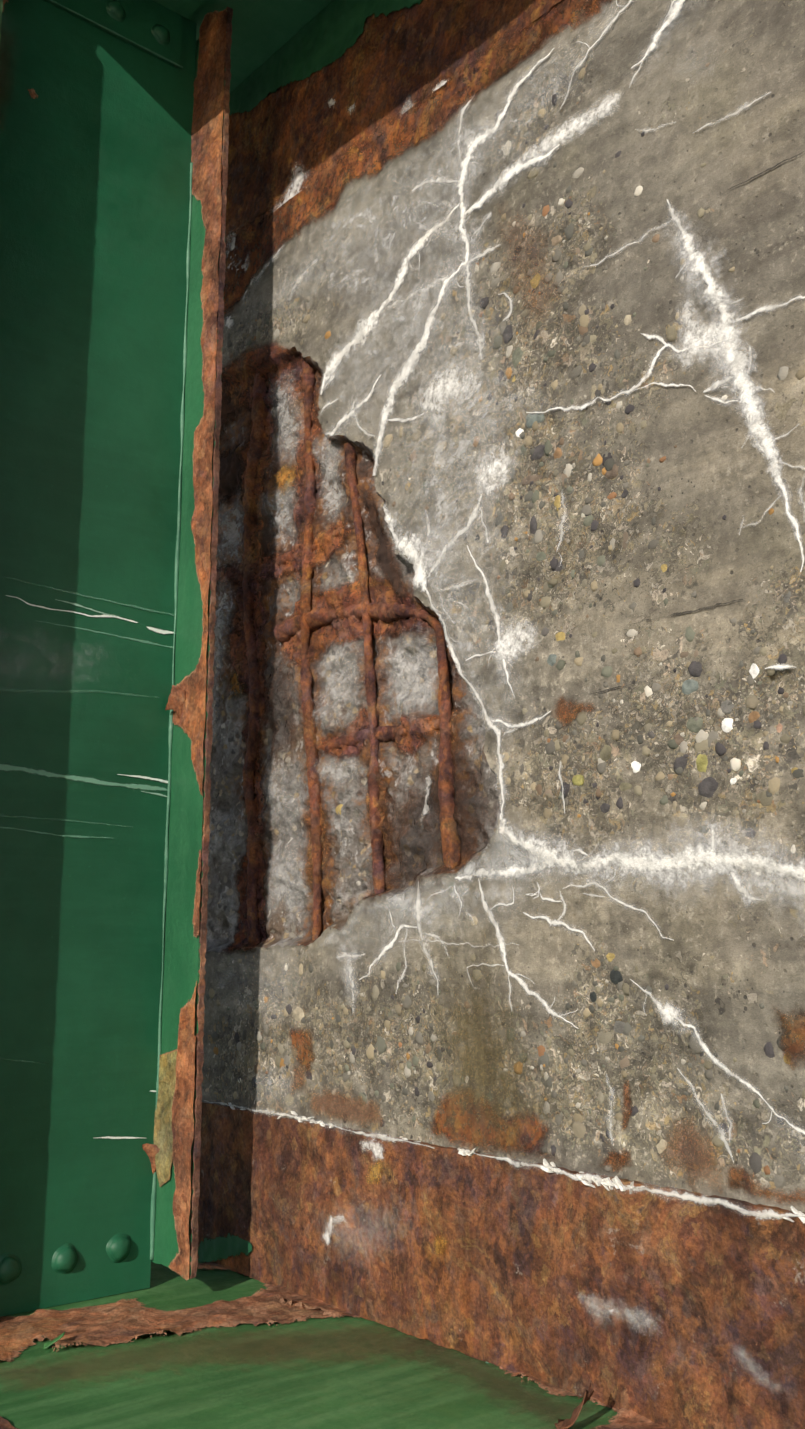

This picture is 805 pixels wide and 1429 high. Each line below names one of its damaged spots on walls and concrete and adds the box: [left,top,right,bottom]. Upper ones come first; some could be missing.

spalling [501,85,558,185]
rust [165,0,603,954]
crack [320,0,805,1029]
spalling [203,167,805,1147]
crack [630,979,805,1134]
rust [142,976,228,1281]
damp [277,1111,340,1128]
damp [356,1132,432,1157]
rust [432,1091,548,1153]
damp [458,1147,805,1223]
spalling [711,1102,785,1188]
rust [499,1366,671,1429]